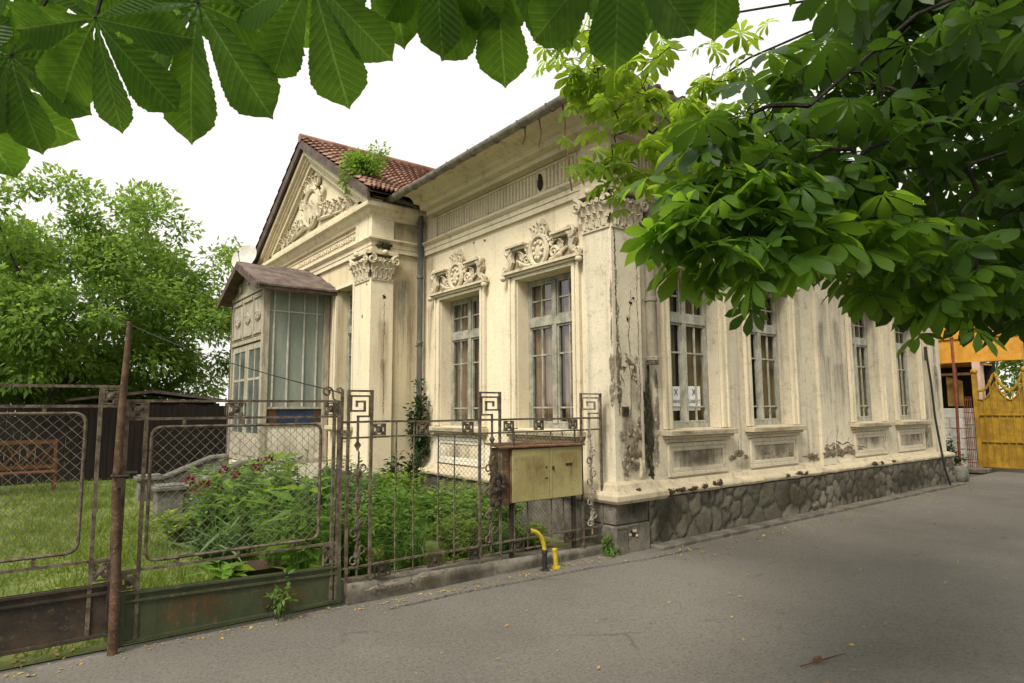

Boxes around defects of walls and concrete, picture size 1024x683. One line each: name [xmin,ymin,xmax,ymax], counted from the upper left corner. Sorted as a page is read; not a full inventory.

crack [614,231,642,447]
flaking render [620,369,661,491]
water stain [645,384,655,460]